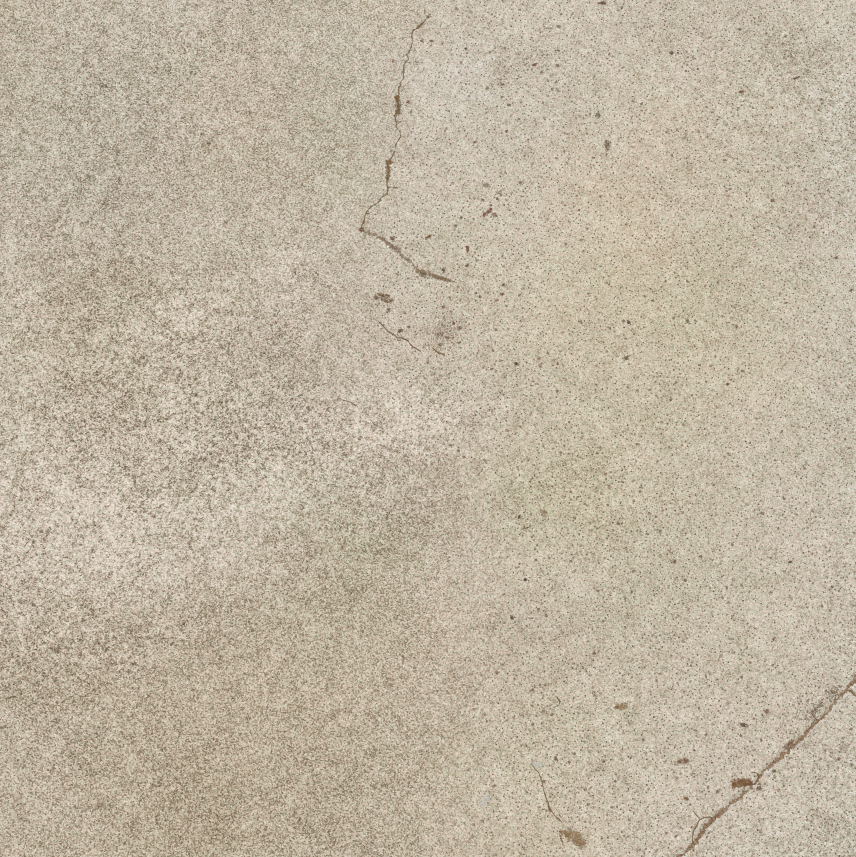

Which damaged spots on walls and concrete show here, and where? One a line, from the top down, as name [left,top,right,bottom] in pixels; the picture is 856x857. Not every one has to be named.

crack [359,9,453,282]
crack [533,766,564,846]
crack [677,676,856,857]